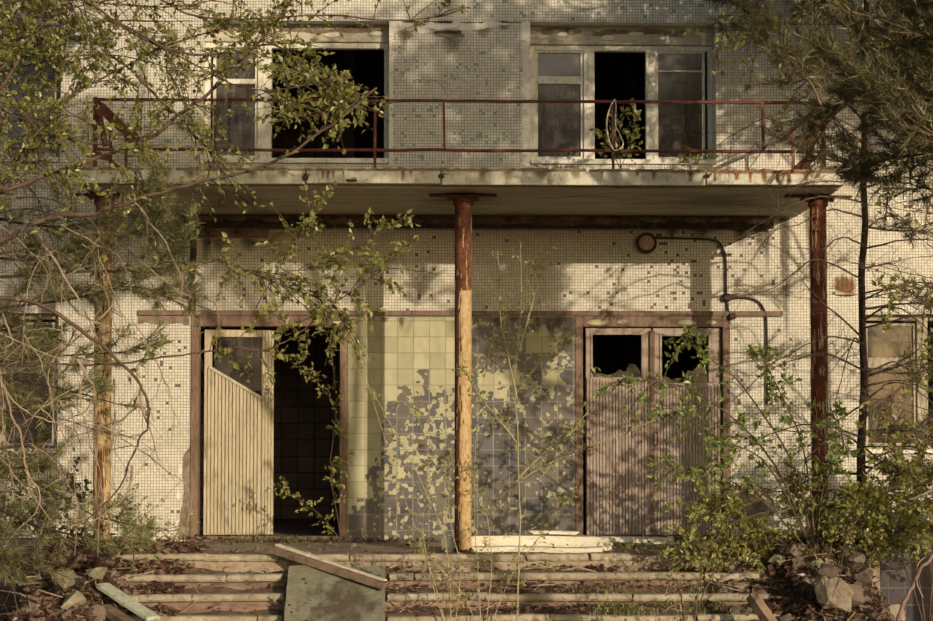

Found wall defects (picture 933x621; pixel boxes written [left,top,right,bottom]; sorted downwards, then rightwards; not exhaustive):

spalling [429,8,469,39]
corrosion [706,170,815,181]
peeling [183,215,775,552]
spalling [610,556,688,572]